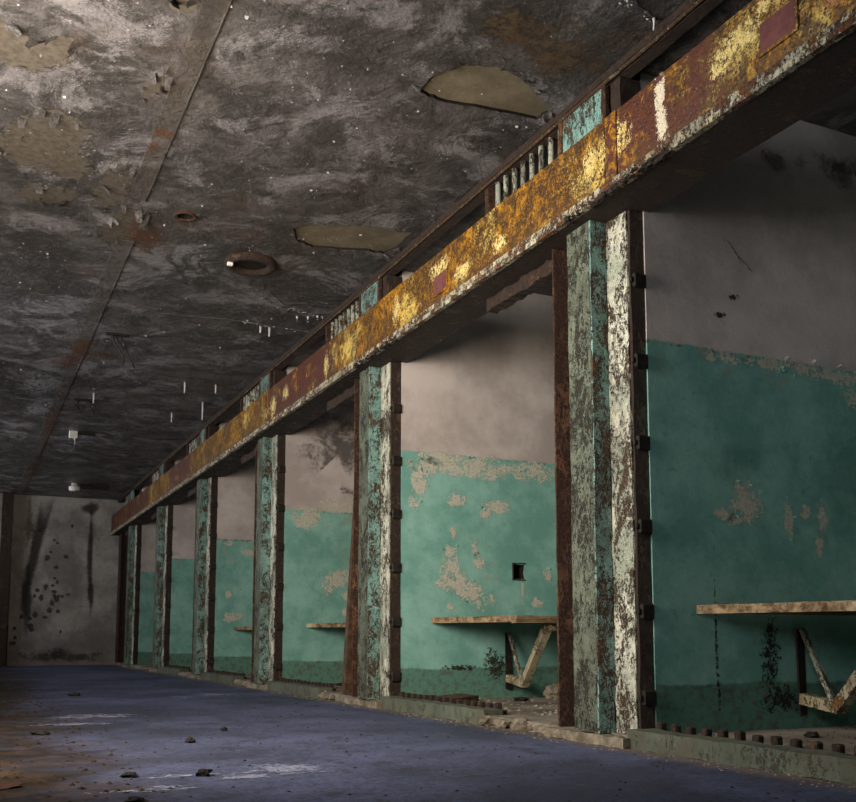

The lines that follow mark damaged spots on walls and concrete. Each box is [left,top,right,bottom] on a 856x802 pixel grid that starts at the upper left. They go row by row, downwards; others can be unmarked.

peeling [0,20,95,74]
crack [619,0,656,22]
peeling [0,103,165,254]
rust [564,145,671,224]
rust [224,252,277,277]
rust [353,336,398,368]
peeling [407,451,555,510]
leakage [22,512,49,625]
leakage [83,503,98,608]
peeling [321,568,349,617]
peeling [434,526,495,612]
leakage [758,615,798,713]